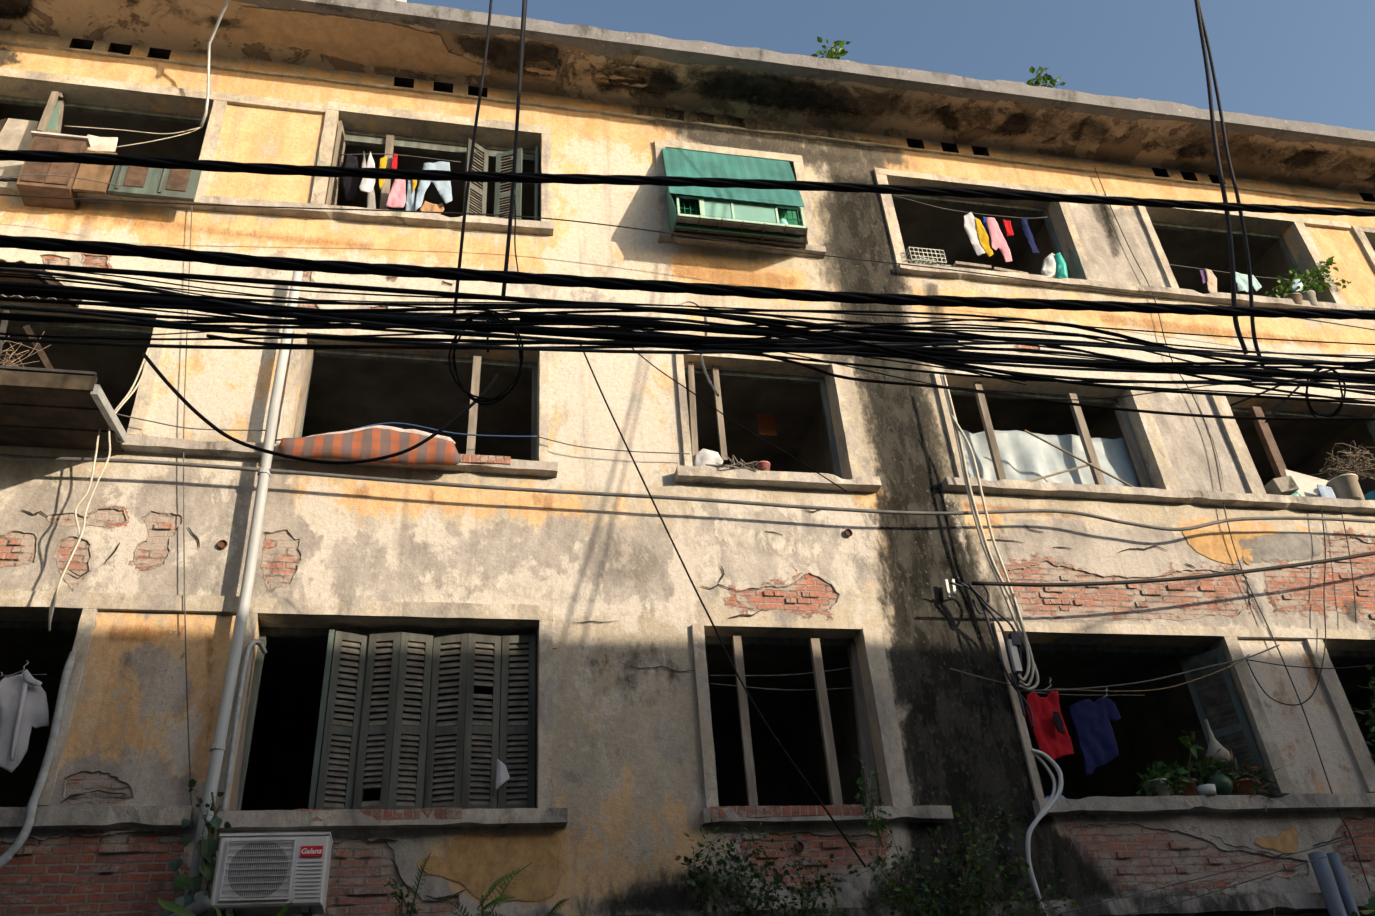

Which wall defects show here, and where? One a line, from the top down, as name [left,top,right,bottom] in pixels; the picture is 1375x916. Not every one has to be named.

damp [454,36,562,77]
damp [584,64,1192,907]
spalling [0,505,183,592]
spalling [260,528,303,595]
damp [391,571,560,599]
spalling [723,564,841,621]
spalling [996,528,1375,630]
spalling [62,769,135,805]
spalling [0,828,192,916]
spalling [1061,816,1310,897]
spalling [1330,810,1375,883]